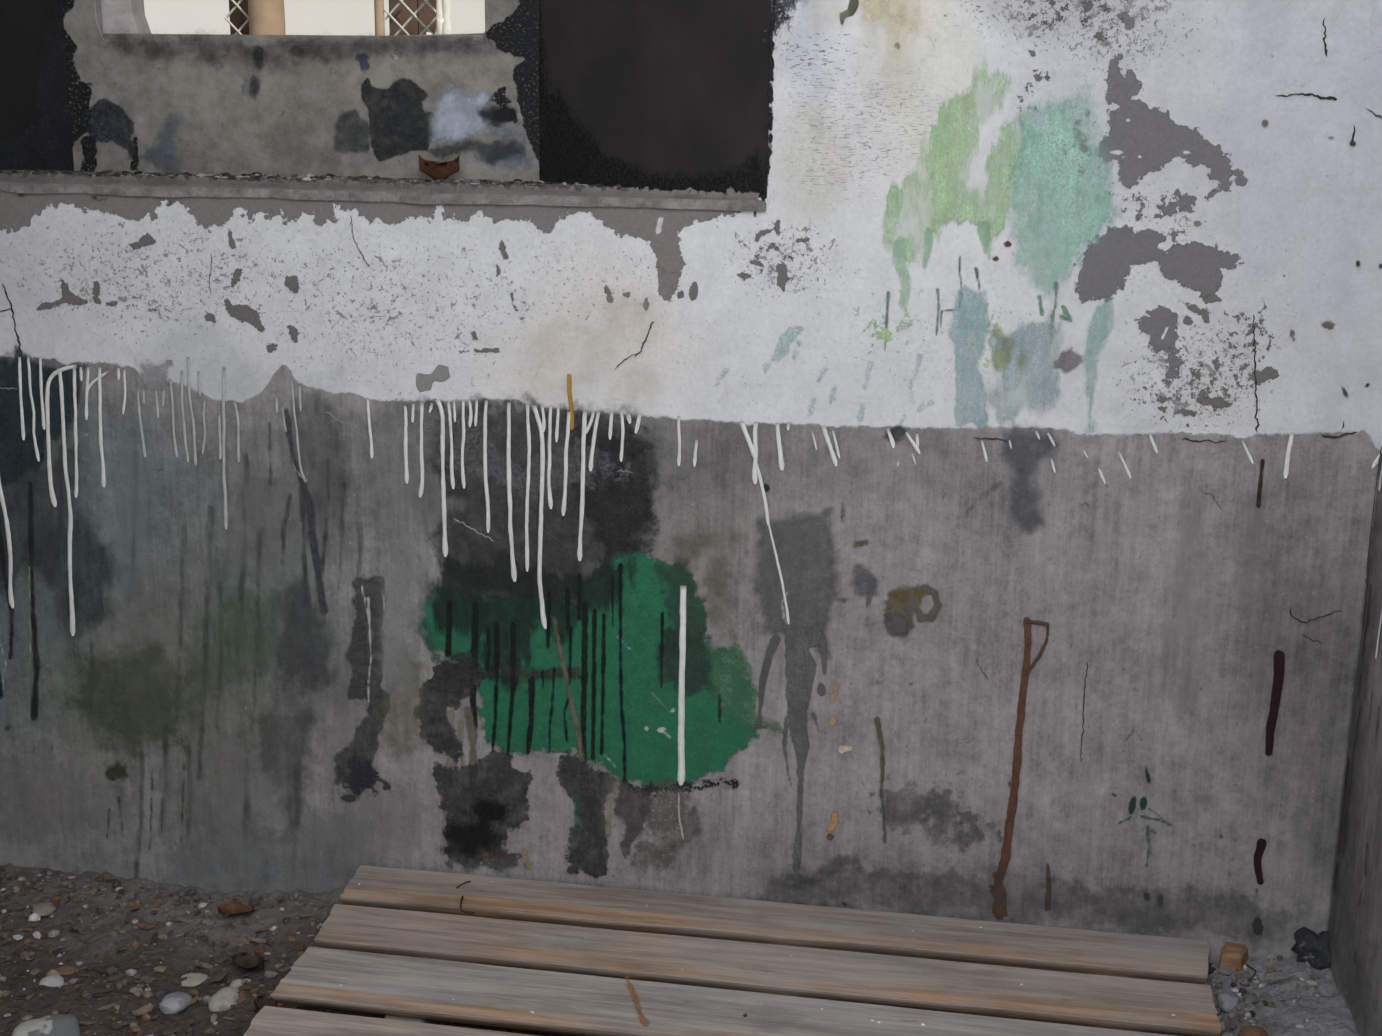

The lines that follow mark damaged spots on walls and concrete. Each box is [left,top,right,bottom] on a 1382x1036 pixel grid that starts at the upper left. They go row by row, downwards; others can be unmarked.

peeling [0,0,764,311]
peeling [723,220,810,292]
peeling [205,268,299,353]
peeling [141,360,172,391]